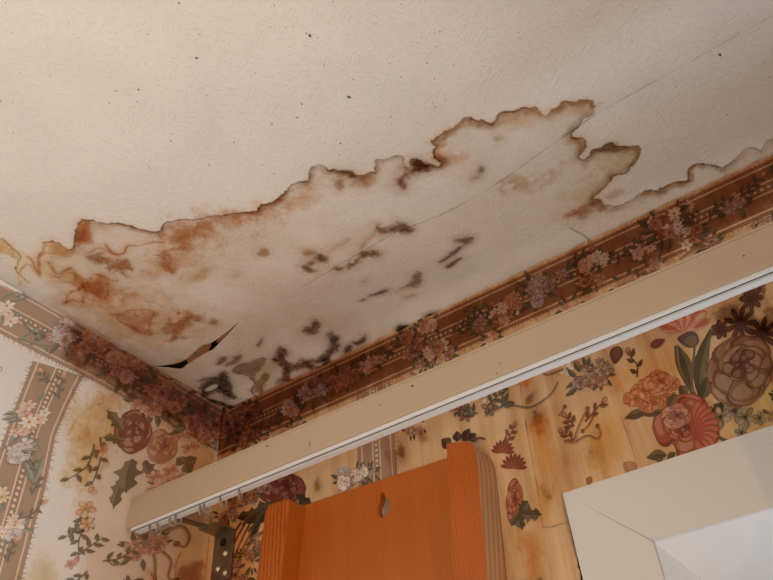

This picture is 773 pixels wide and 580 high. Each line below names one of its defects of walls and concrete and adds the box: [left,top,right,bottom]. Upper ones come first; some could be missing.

damp [399,138,443,184]
damp [379,224,413,232]
damp [441,238,471,268]
mould [260,333,365,382]
mould [201,357,241,409]